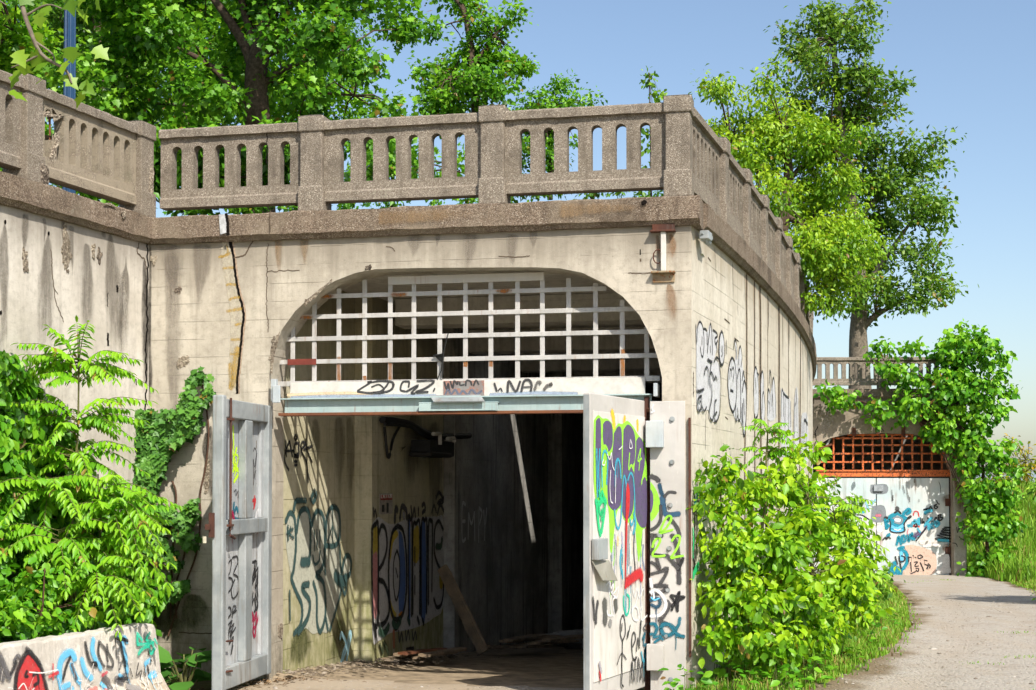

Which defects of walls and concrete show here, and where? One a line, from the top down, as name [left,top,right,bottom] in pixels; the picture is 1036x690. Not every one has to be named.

water stain [0,226,8,311]
water stain [42,231,50,300]
water stain [62,222,92,308]
water stain [103,233,128,326]
water stain [142,249,152,390]
crack [225,211,300,394]